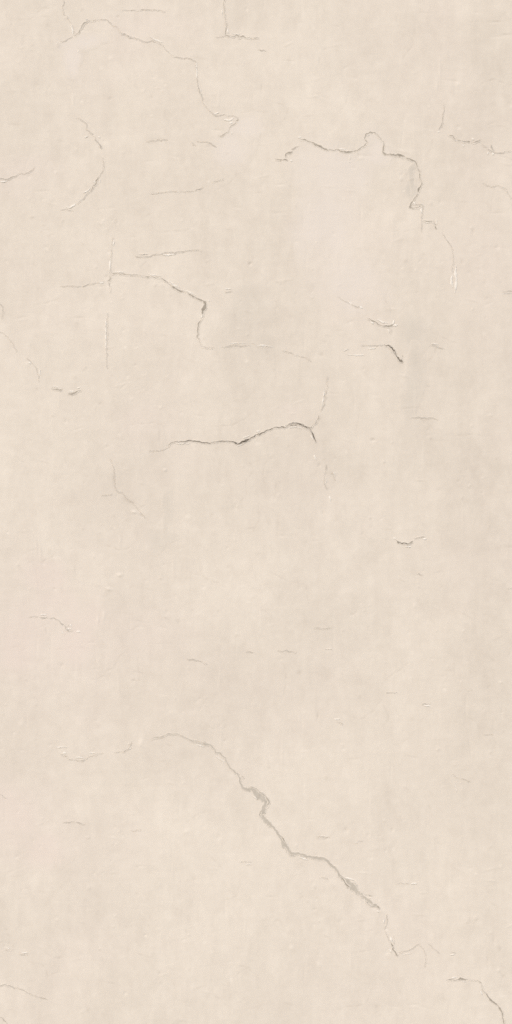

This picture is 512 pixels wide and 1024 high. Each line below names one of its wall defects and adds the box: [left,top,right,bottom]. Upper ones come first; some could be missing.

crack [275,131,457,292]
crack [60,238,336,501]
crack [336,297,403,363]
crack [56,732,439,968]
crack [446,977,505,1024]